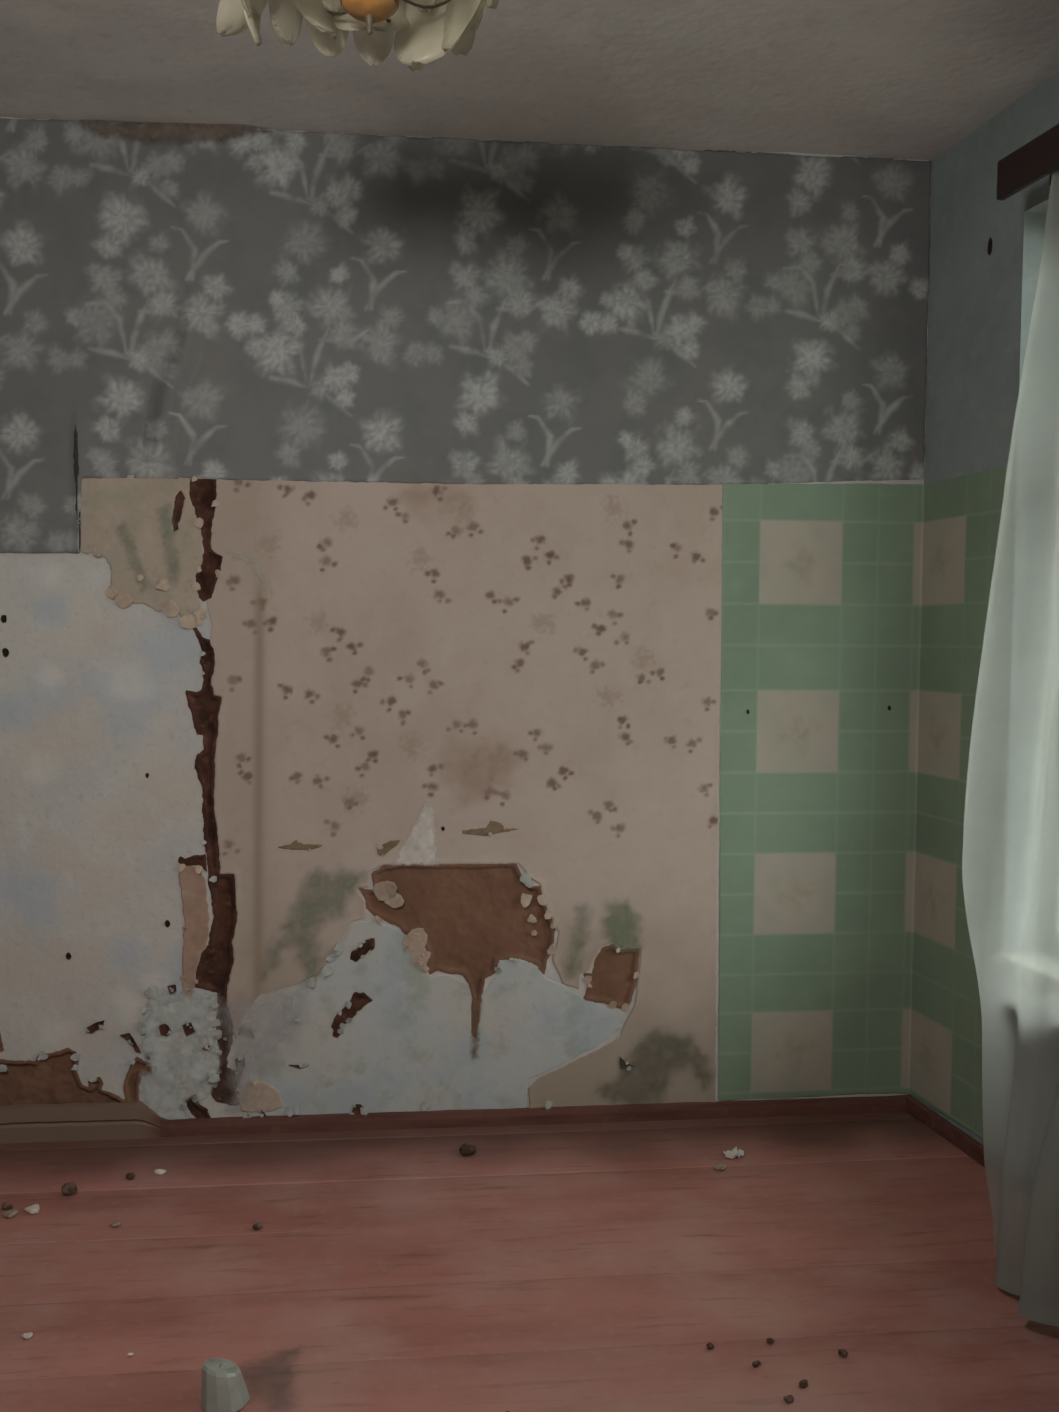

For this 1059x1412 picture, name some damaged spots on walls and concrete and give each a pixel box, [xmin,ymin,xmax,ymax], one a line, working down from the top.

crack [171,476,254,1118]
peeling [0,845,640,1120]
leakage [604,1035,707,1102]